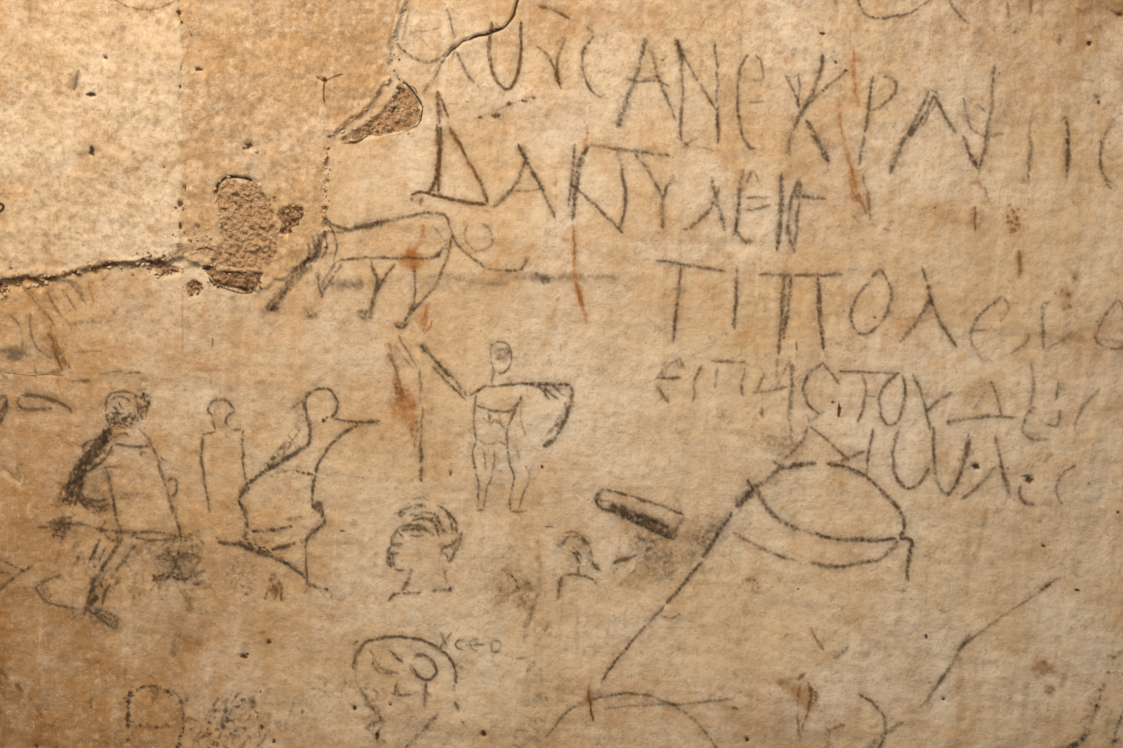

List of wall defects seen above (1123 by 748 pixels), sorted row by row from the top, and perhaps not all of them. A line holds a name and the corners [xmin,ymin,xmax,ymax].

crack [446,0,519,57]
spalling [321,0,424,247]
spalling [0,175,303,300]